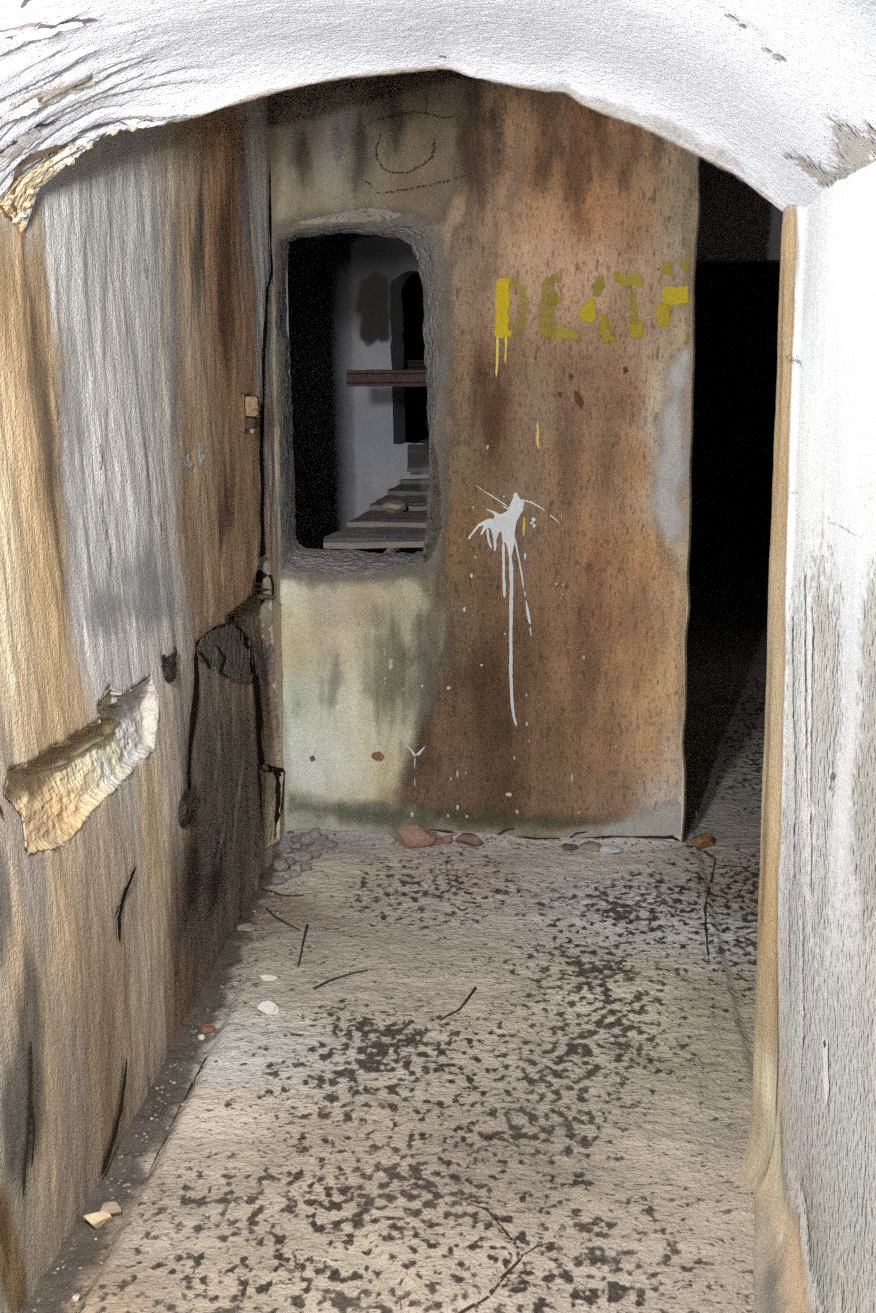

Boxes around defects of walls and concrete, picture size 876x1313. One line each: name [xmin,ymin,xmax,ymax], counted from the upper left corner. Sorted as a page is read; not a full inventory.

flaking render [0,15,98,41]
spalling [0,85,154,232]
peeling [783,109,876,188]
water stain [59,355,161,633]
corrosion [401,76,696,827]
water stain [0,855,10,953]
flaking render [3,677,159,855]
water stain [175,694,268,996]
water stain [571,803,681,839]
water stain [689,680,766,823]
water stain [3,954,42,1170]
water stain [76,835,761,1313]